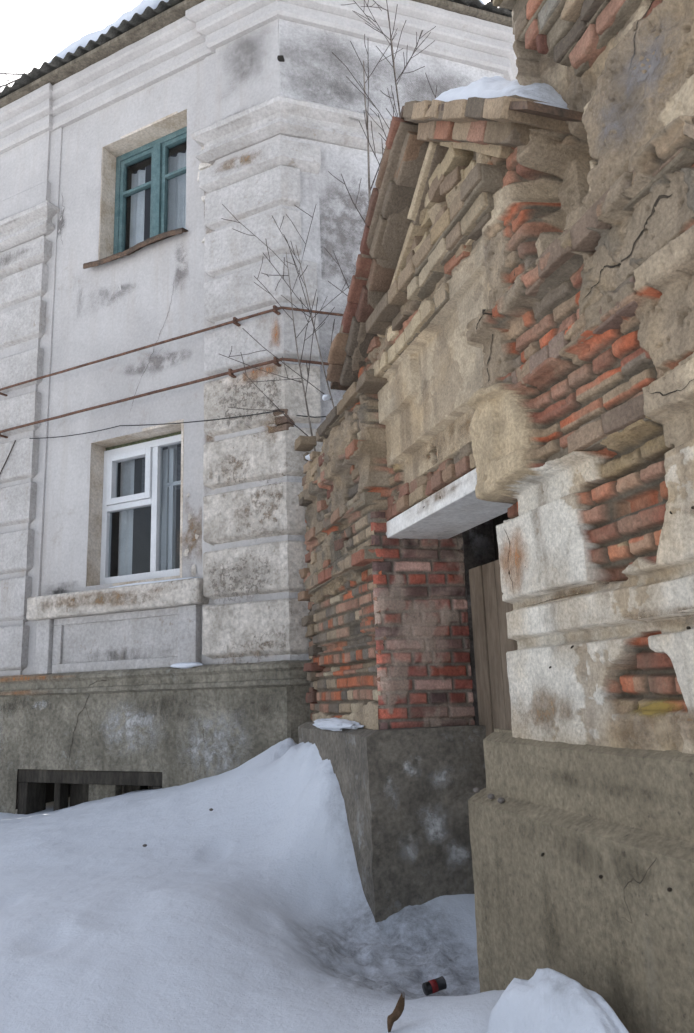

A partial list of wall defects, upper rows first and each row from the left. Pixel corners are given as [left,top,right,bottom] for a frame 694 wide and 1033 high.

spalling [444,212,491,275]
crack [585,194,672,297]
spalling [367,311,410,371]
spalling [299,485,334,512]
flaking render [600,630,688,714]
crack [69,680,107,759]